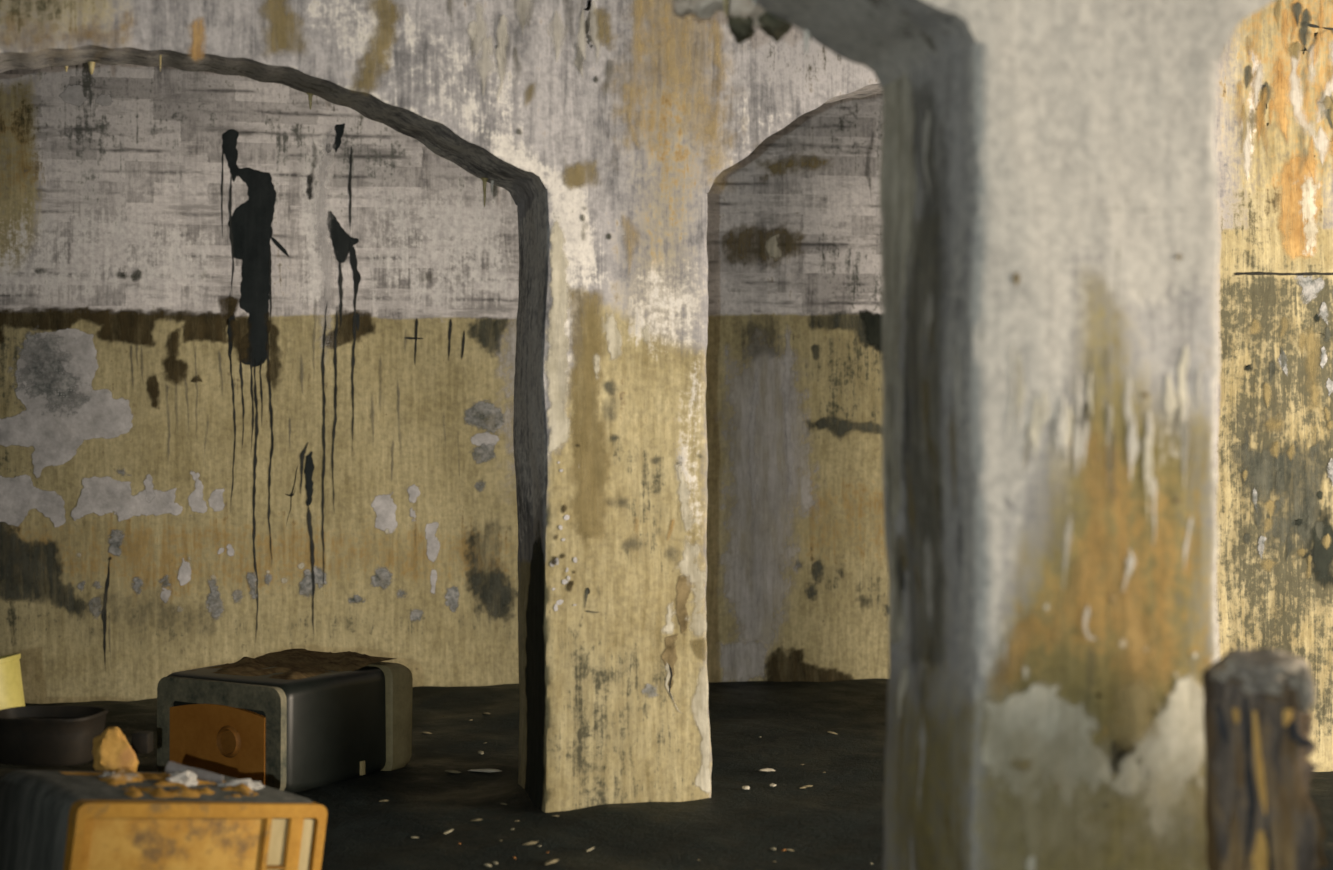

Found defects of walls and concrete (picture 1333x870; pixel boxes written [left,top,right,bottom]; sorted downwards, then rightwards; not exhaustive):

corrosion [1239,0,1324,180]
corrosion [1280,94,1333,258]
peeling [0,328,225,556]
water stain [0,149,291,642]
water stain [300,135,375,630]
water stain [405,319,424,362]
water stain [448,318,516,430]
water stain [1235,323,1333,586]
water stain [1296,275,1333,429]
water stain [101,560,110,669]
water stain [468,536,546,811]